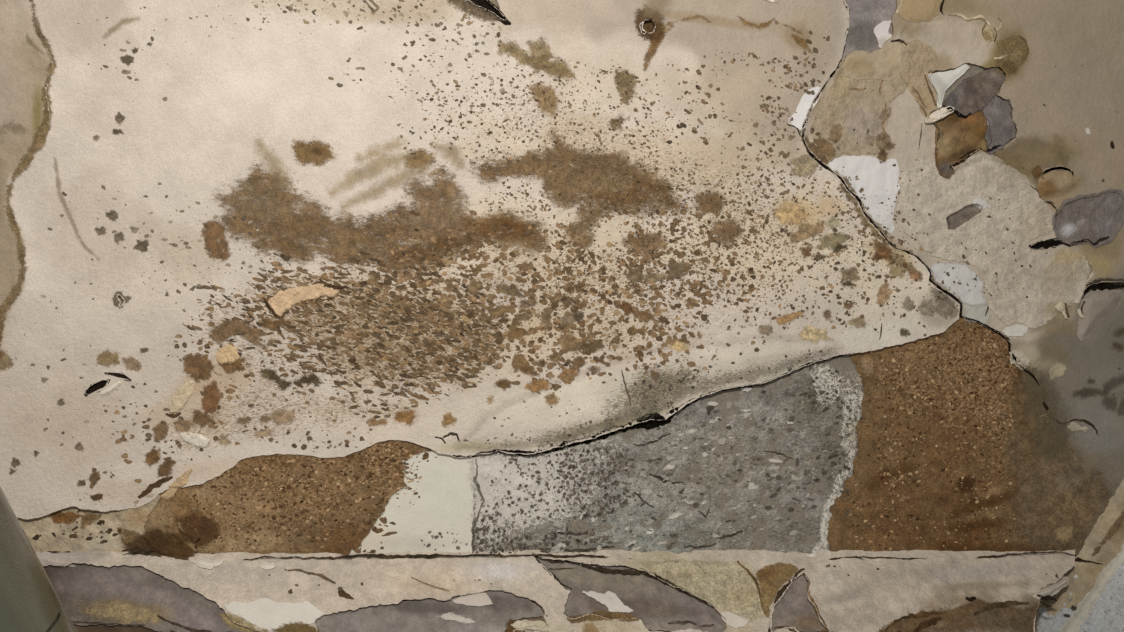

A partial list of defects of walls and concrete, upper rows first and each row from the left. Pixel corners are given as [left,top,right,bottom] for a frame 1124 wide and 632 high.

water stain [0,0,56,370]
spalling [17,363,853,632]
water stain [57,0,1032,557]
crack [435,353,849,458]
crack [787,1,1098,435]
peeling [788,0,1124,336]
spalling [879,576,1122,632]
peeling [1009,350,1029,370]
peeling [1047,363,1066,380]